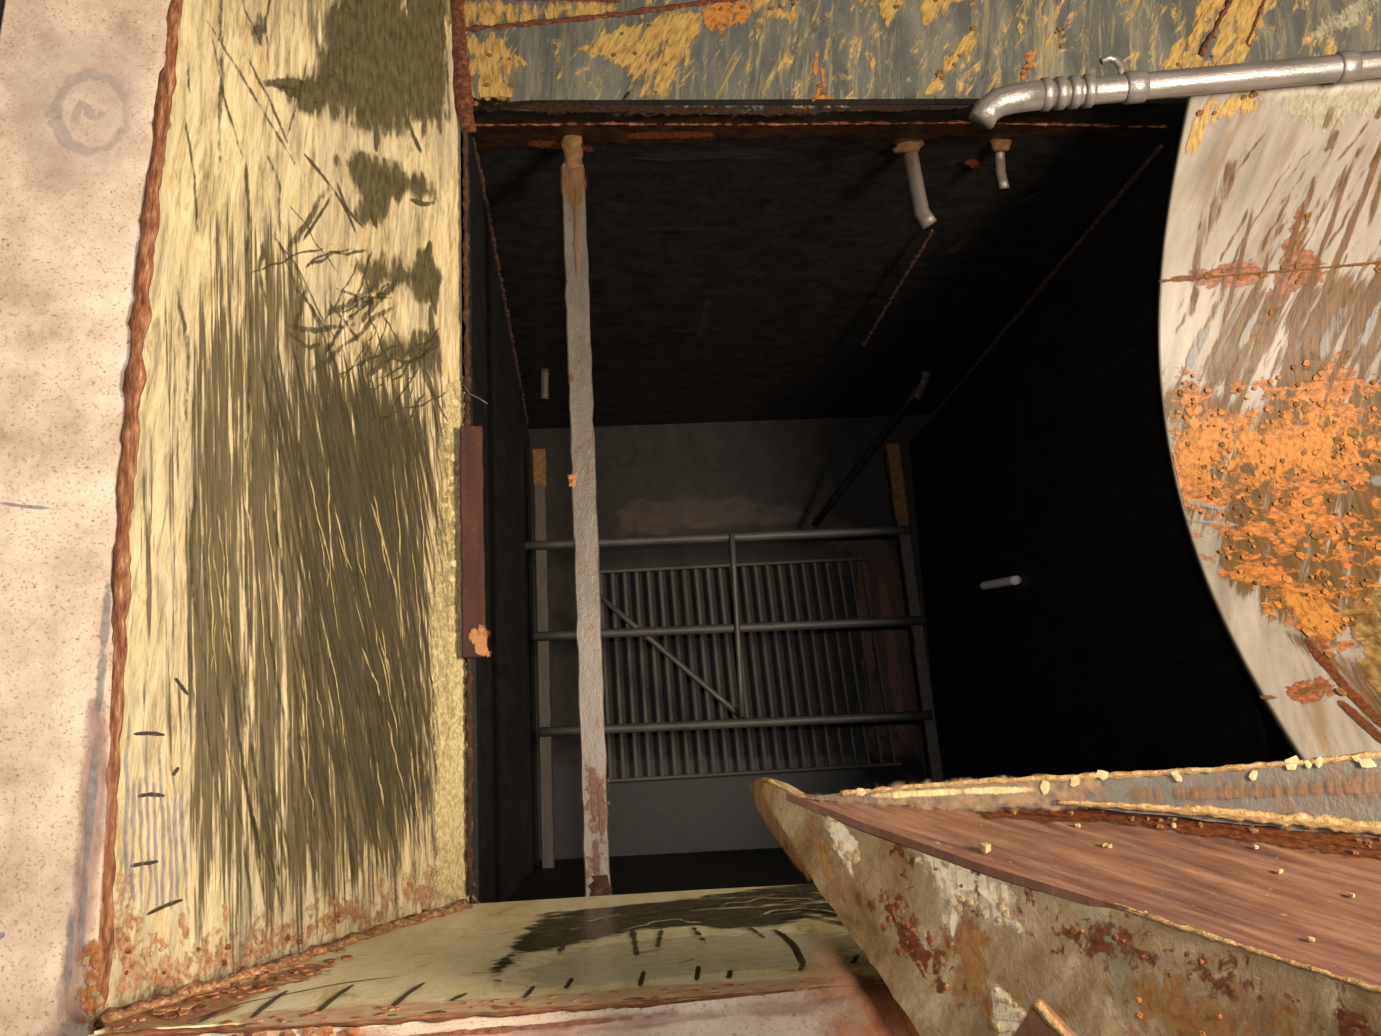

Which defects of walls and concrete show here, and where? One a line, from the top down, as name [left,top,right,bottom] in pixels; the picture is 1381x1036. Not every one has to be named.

rust [1162,0,1272,70]
water stain [175,0,448,901]
rust [469,625,490,657]
rust [807,518,1381,859]
rust [61,593,476,1036]
rust [585,765,610,879]
rust [411,1013,717,1036]
water stain [495,893,873,988]
rust [750,778,999,1036]
rust [1018,888,1379,1036]